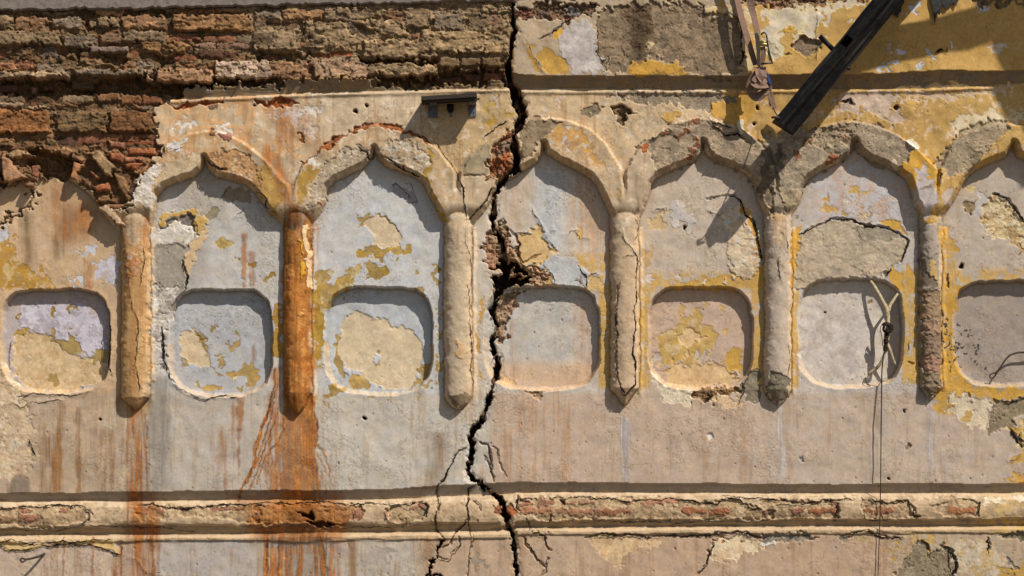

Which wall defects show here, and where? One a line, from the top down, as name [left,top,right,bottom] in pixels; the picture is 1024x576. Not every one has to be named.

crack [0,8,571,576]
spalling [0,0,882,410]
crack [580,208,667,395]
spalling [581,81,1024,484]
crack [709,195,909,281]
peeling [0,302,109,481]
corrosion [238,212,342,576]
spalling [0,504,121,554]
corrosion [114,408,160,576]
spalling [493,495,840,569]
crack [553,495,957,575]
peeling [860,495,1024,576]